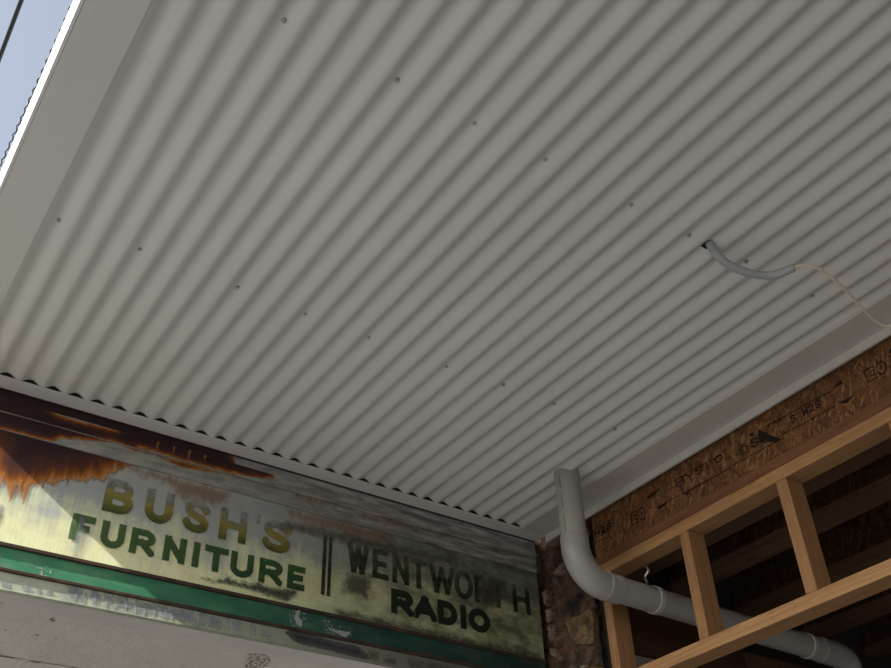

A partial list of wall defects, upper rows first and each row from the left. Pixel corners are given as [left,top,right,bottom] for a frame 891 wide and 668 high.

rust [0,389,274,503]